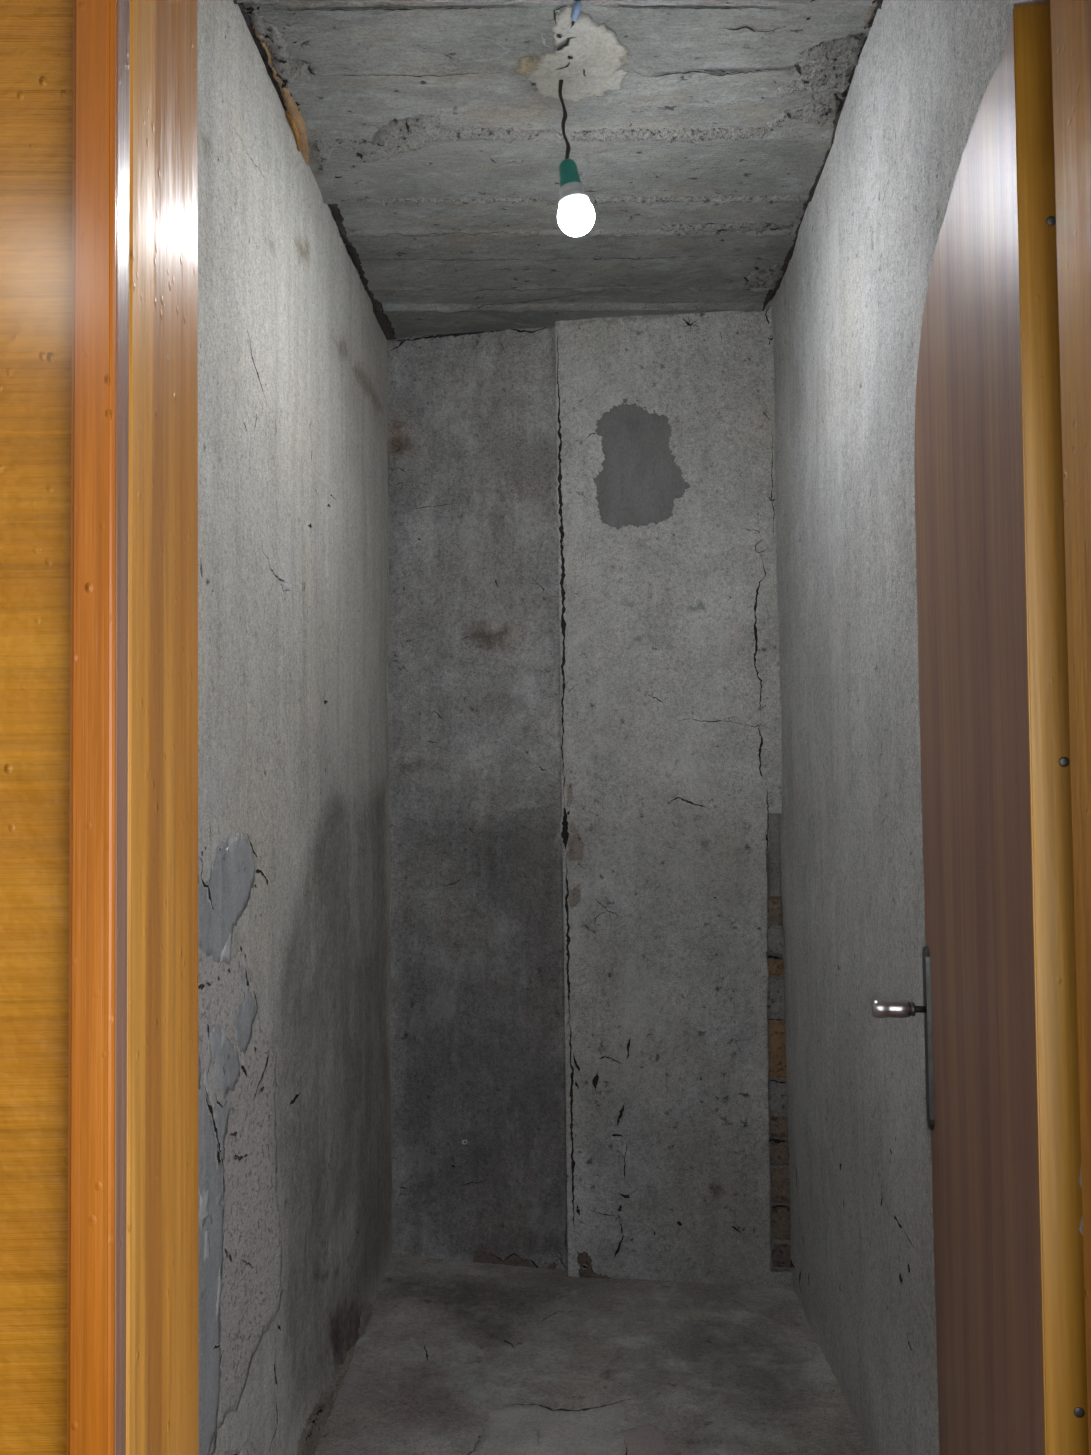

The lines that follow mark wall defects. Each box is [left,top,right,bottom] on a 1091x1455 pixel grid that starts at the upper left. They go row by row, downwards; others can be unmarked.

crack [359,201,649,1258]
flaking render [586,399,690,530]
crack [649,411,782,875]
crack [765,307,773,345]
spalling [198,933,283,1455]